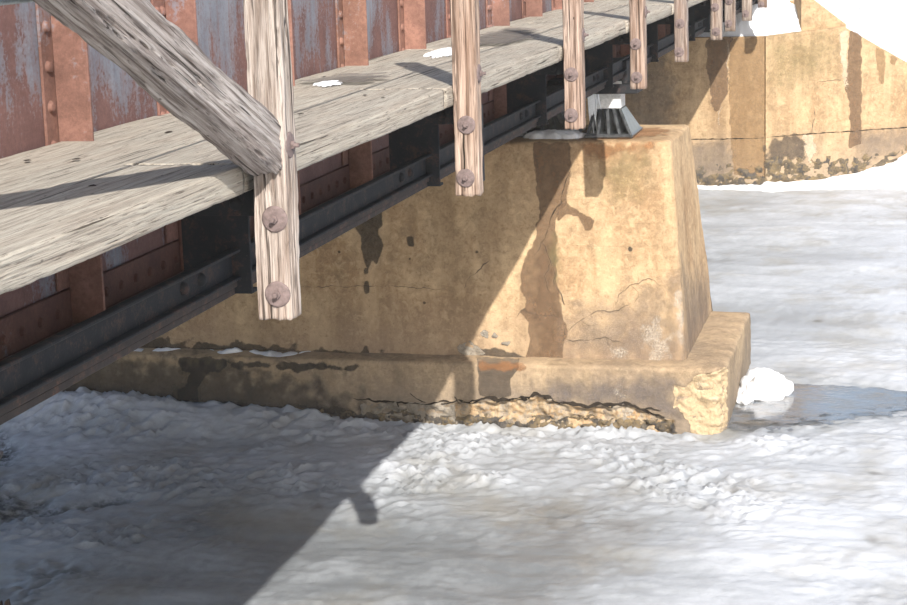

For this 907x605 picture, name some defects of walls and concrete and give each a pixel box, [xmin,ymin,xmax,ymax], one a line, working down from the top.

damp [705,36,816,175]
damp [840,30,862,148]
damp [355,213,383,294]
crack [517,171,660,345]
damp [63,337,358,417]
spalling [319,367,729,435]